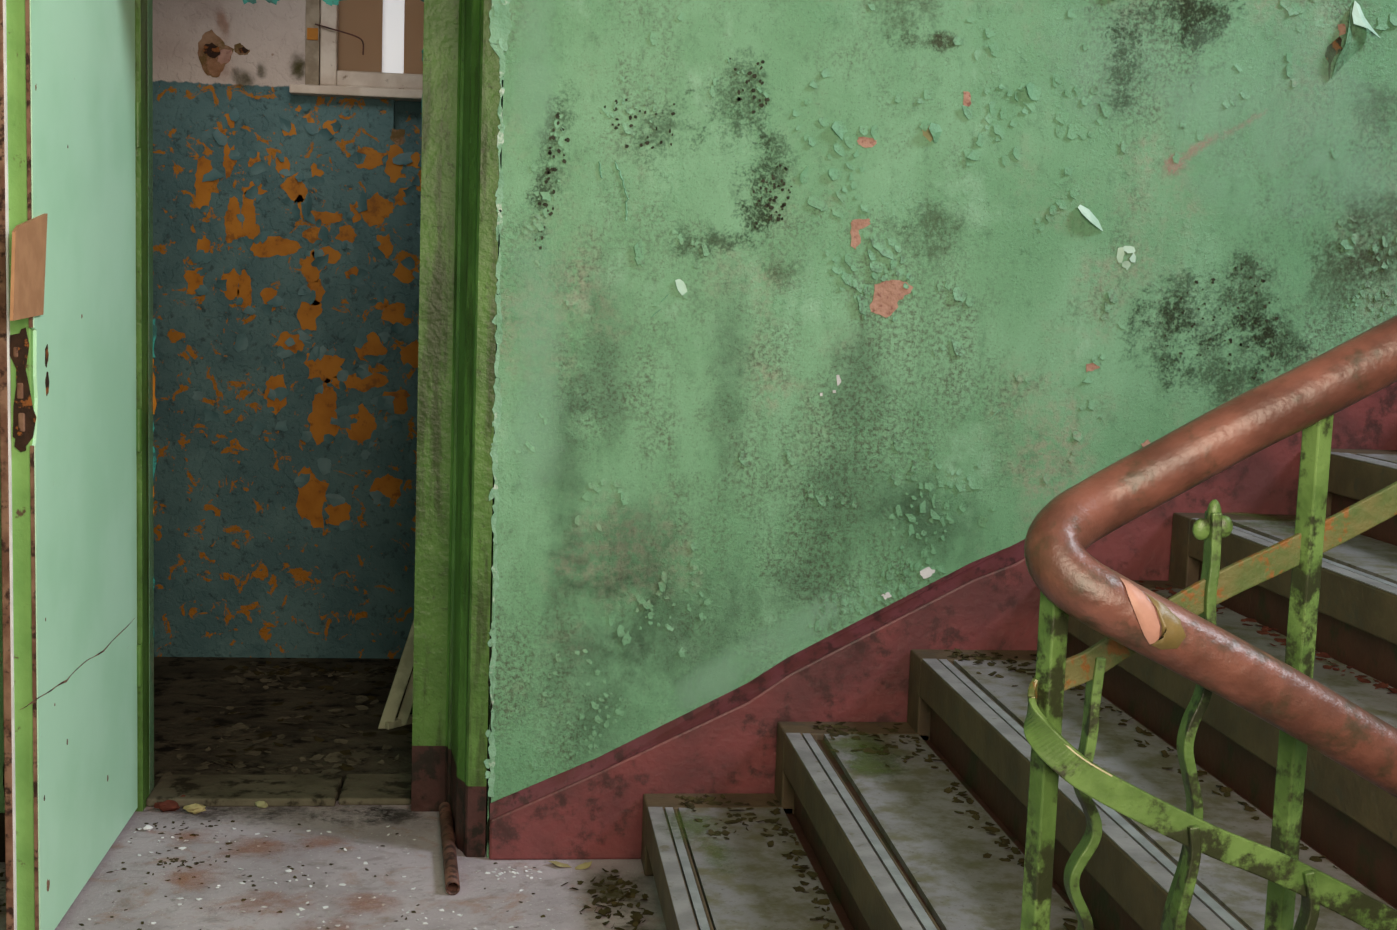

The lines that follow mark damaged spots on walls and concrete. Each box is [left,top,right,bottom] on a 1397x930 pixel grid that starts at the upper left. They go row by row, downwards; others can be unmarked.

spalling [198,29,250,78]
peeling [278,99,351,141]
peeling [602,77,675,149]
peeling [728,58,770,114]
peeling [962,75,1063,167]
peeling [523,112,570,269]
peeling [752,68,917,322]
peeling [1338,214,1397,316]
peeling [183,107,422,532]
peeling [807,434,998,633]
peeling [608,542,712,646]